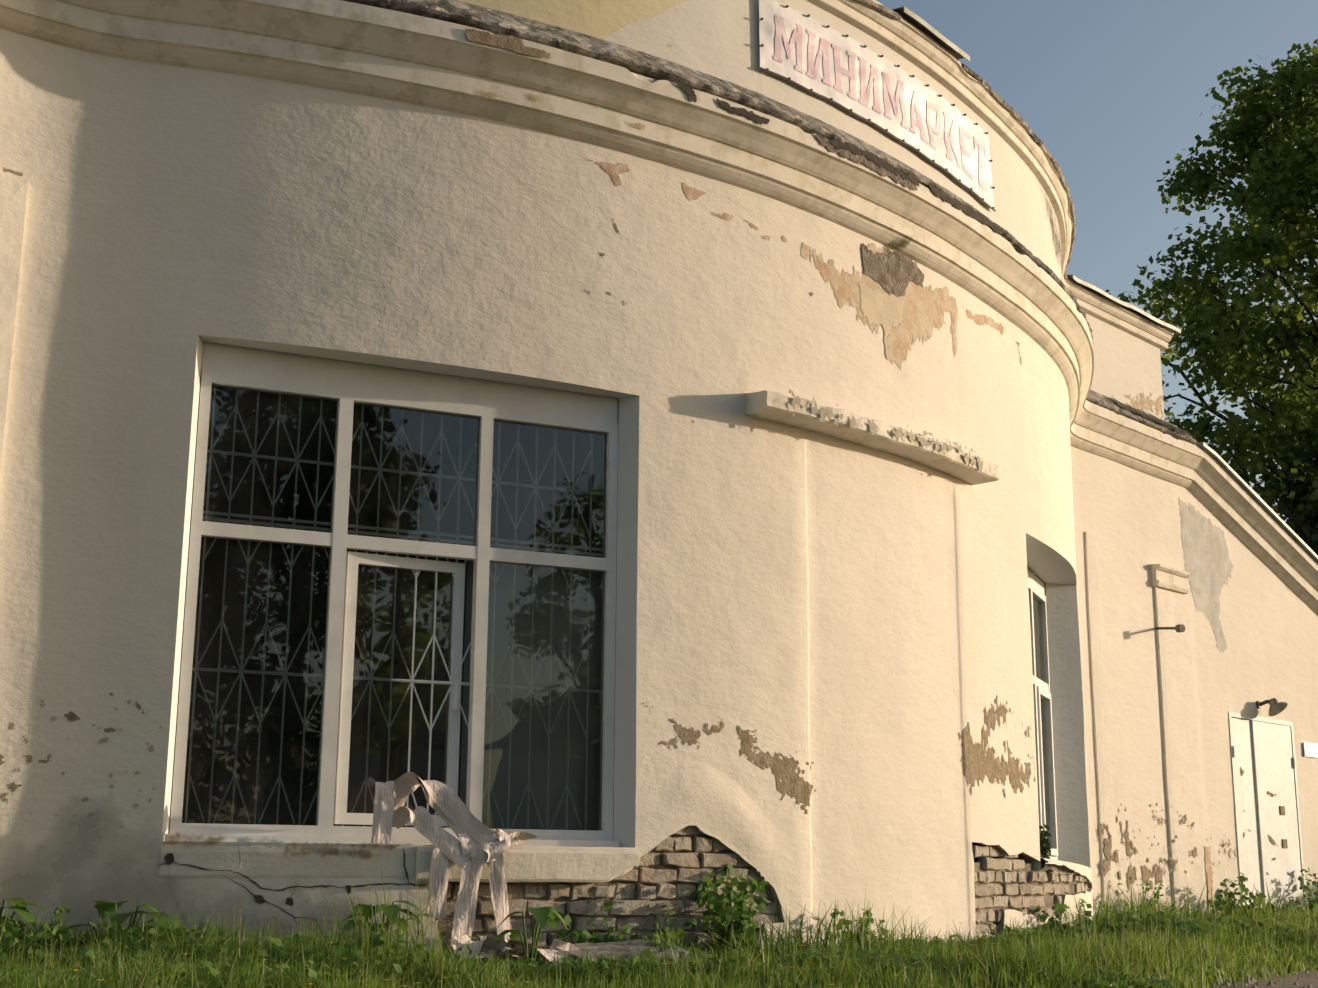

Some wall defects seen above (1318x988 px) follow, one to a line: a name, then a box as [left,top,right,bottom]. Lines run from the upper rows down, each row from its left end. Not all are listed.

peeling [587,159,629,186]
peeling [682,183,706,200]
peeling [712,212,1004,370]
peeling [789,389,990,473]
peeling [0,723,52,803]
spalling [40,699,121,743]
peeling [659,718,816,815]
peeling [958,695,1036,798]
crack [158,846,426,941]
spalling [435,882,460,948]
spalling [471,825,784,960]
spalling [972,803,1251,936]